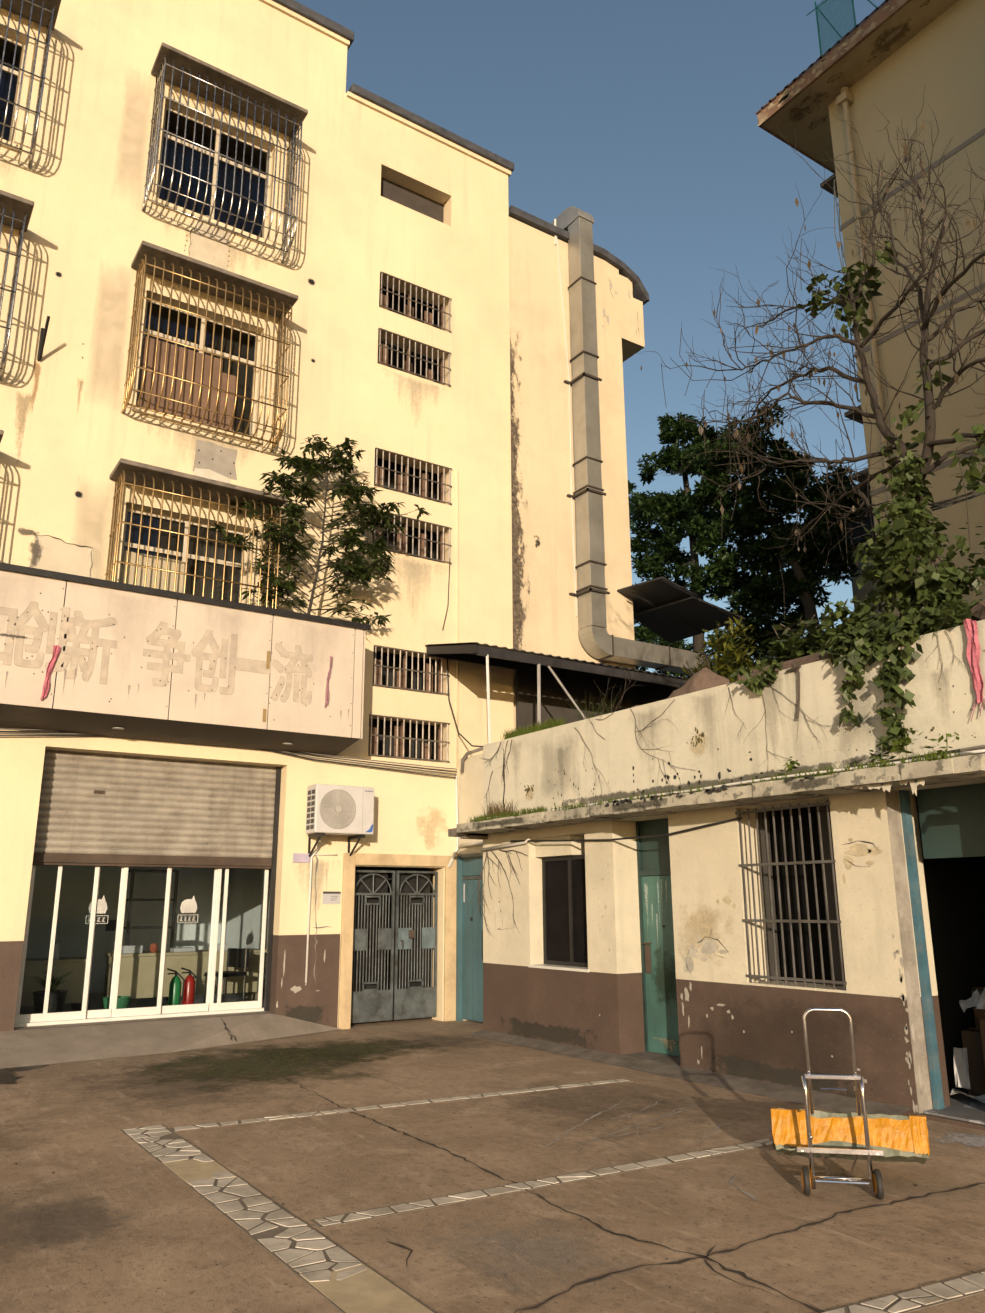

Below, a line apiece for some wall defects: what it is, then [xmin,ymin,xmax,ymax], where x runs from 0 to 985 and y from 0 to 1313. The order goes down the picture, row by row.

damp [510,364,529,650]
damp [549,749,873,811]
peeling [842,838,883,883]
peeling [680,933,728,1027]
damp [0,1064,49,1084]
crack [704,1245,771,1294]